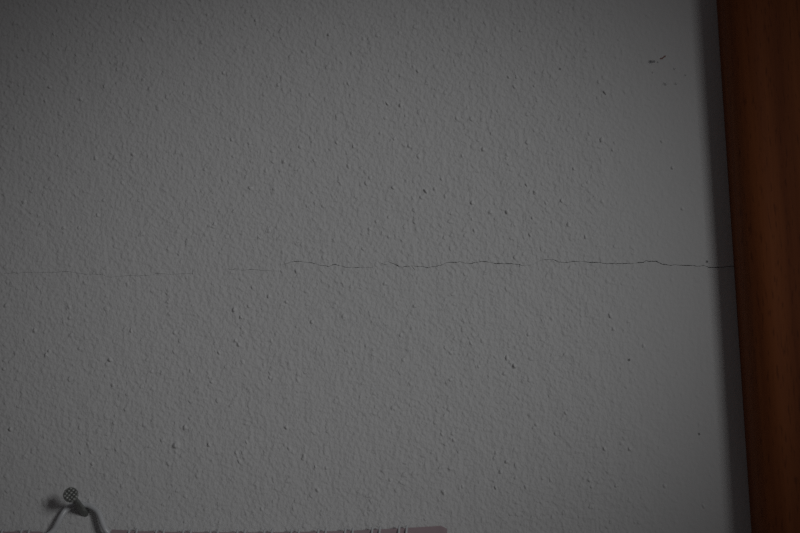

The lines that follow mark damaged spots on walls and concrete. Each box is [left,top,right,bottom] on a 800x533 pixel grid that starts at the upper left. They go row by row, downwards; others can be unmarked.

crack [286,259,734,270]